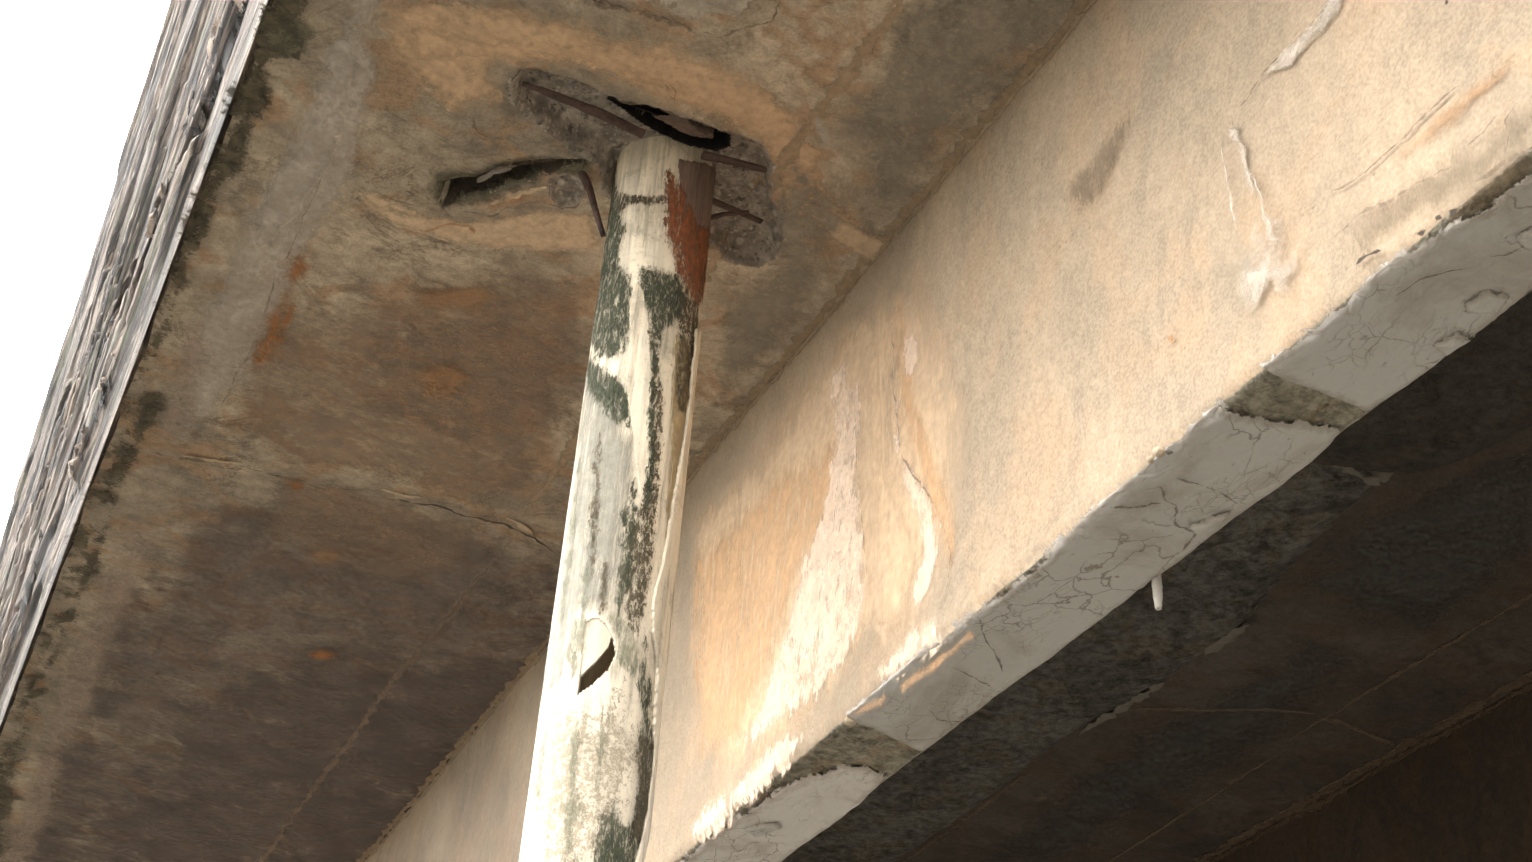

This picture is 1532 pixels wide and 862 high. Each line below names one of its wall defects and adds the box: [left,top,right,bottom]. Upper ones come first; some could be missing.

crack [221,174,323,406]
rust [252,257,308,364]
leakage [164,0,883,494]
spalling [507,66,785,268]
leakage [847,0,1072,201]
crack [1228,0,1341,195]
peeling [1259,174,1532,412]
crack [1329,85,1532,237]
crack [147,450,555,554]
peeling [844,311,1341,751]
leakage [9,481,559,862]